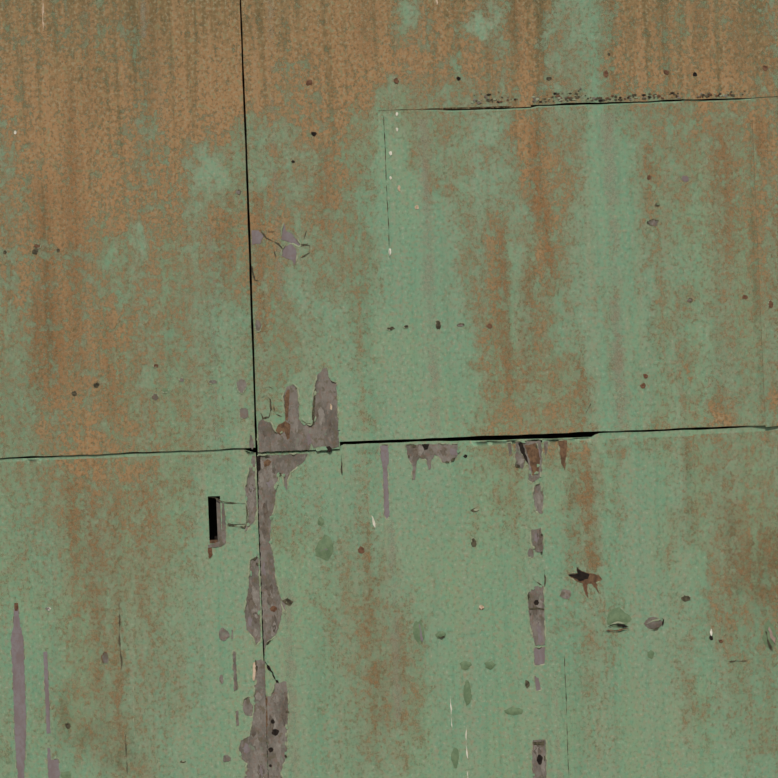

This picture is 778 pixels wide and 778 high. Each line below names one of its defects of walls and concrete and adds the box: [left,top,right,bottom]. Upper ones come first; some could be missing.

rust [597,0,778,349]
rust [0,0,600,778]
peeling [379,443,390,520]
peeling [404,443,460,480]
peeling [223,367,340,778]
peeling [527,528,545,559]
peeling [567,567,602,597]
peeling [10,603,28,778]
peeling [219,650,239,691]
peeling [525,585,546,692]
peeling [531,739,548,778]